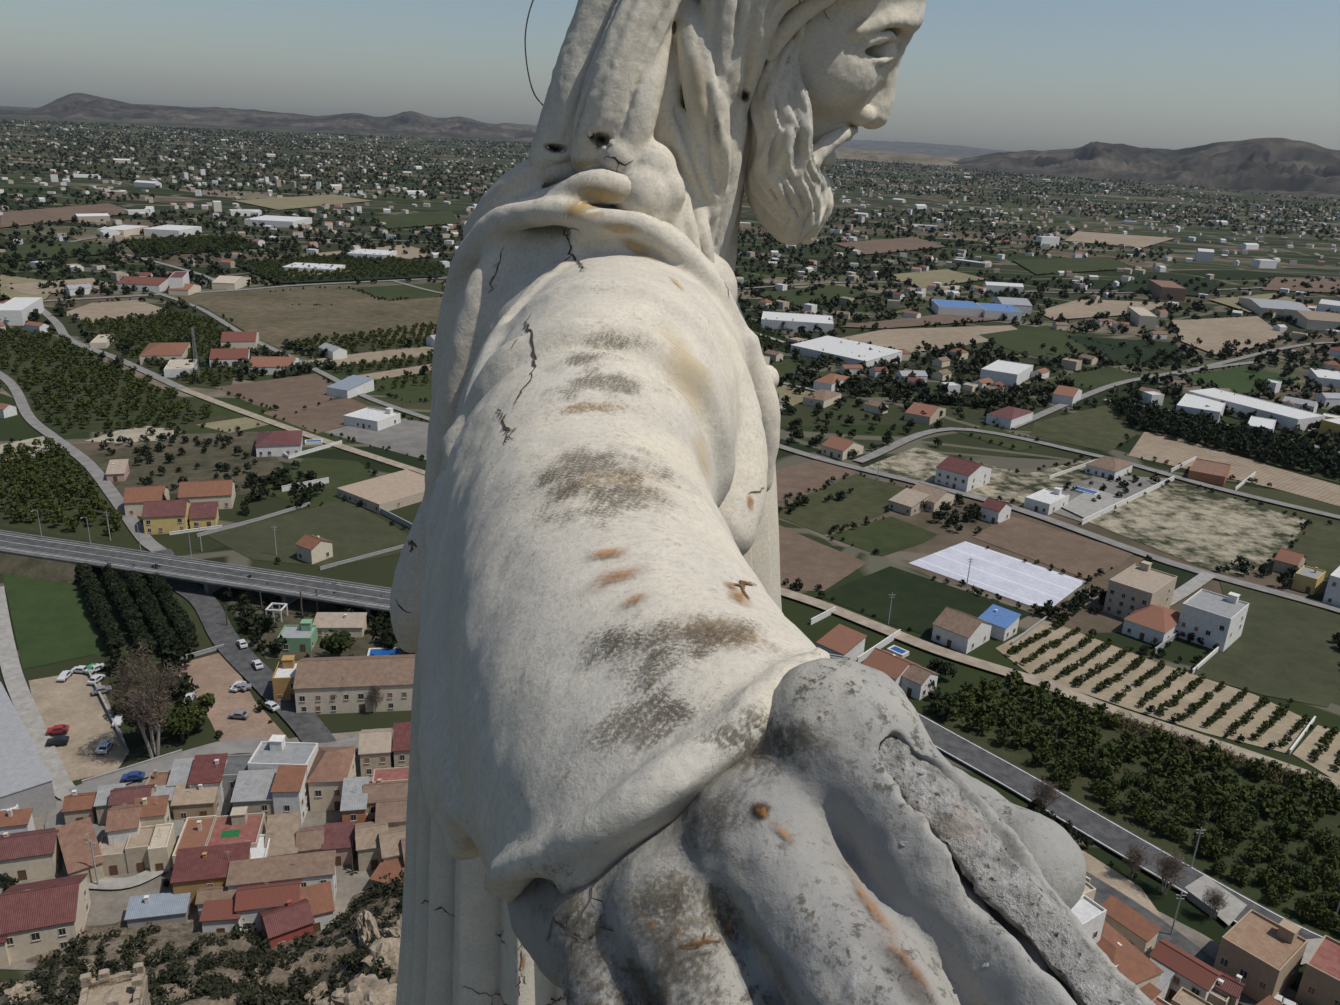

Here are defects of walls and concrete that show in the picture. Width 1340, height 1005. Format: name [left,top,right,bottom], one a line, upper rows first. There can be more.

spalling [588,130,615,151]
crack [563,227,585,271]
crack [497,313,537,443]
damp [561,402,624,414]
damp [677,617,768,645]